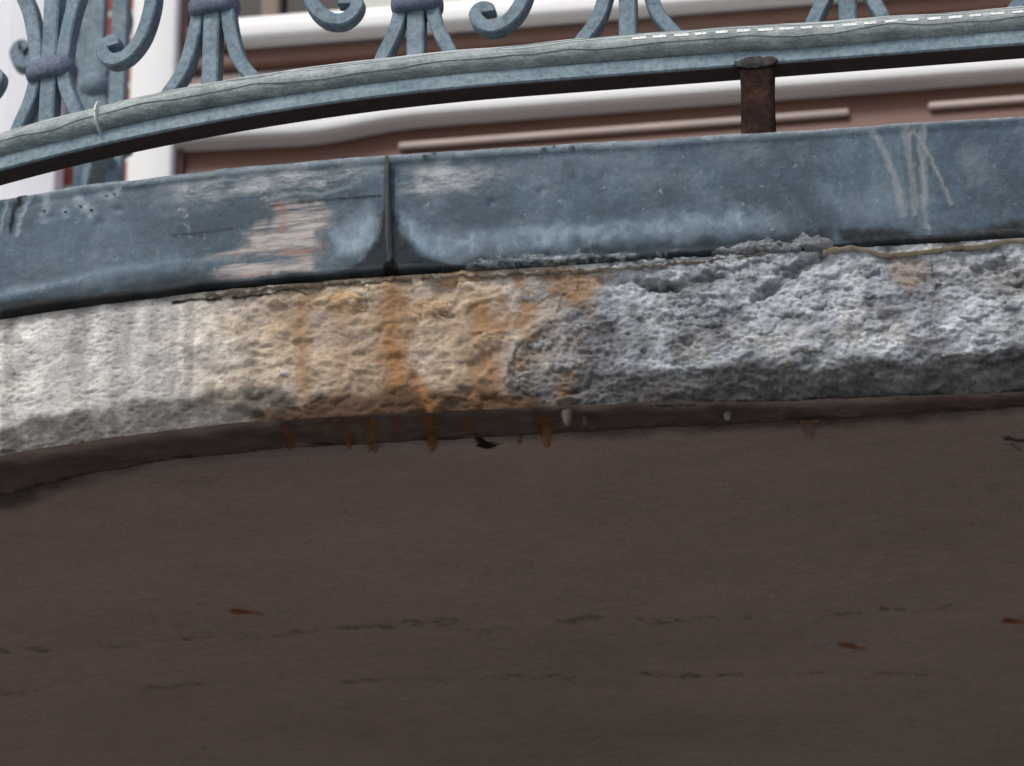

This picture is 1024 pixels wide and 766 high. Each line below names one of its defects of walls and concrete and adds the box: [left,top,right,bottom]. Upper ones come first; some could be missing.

peeling [204,202,776,297]
corrosion [255,281,543,426]
leakage [0,350,1024,507]